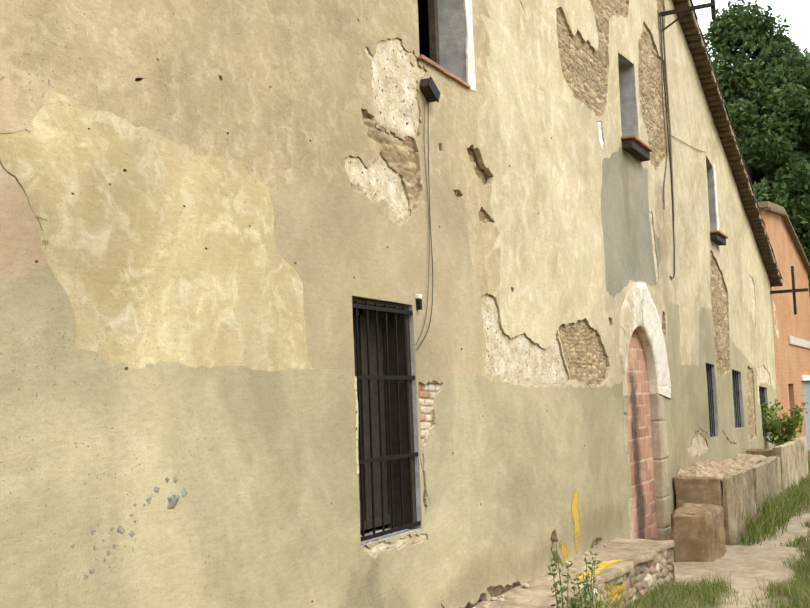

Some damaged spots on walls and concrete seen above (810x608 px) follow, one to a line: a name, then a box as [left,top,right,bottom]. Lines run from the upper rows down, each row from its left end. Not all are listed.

flaking render [344,38,425,222]
spalling [467,143,488,184]
spalling [556,0,629,150]
spalling [638,0,667,170]
spalling [478,209,490,226]
flaking render [481,292,607,387]
spalling [710,251,730,376]
flaking render [418,381,440,460]
flaking render [688,434,708,458]
spalling [364,531,426,558]